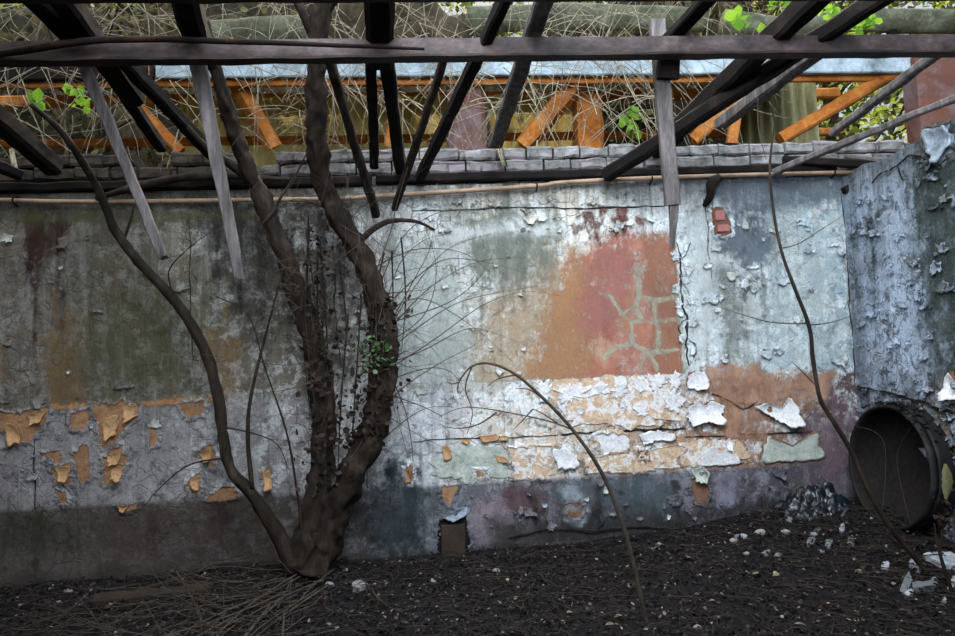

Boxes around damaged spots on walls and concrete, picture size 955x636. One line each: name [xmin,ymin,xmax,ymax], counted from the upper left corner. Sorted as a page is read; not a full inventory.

spalling [915,119,955,210]
water stain [16,208,106,316]
corrosion [472,205,683,382]
crack [602,198,712,371]
flaking render [703,202,750,269]
peeling [881,231,955,321]
spalling [0,378,213,510]
spalling [182,438,244,505]
water stain [364,460,428,558]
water stain [472,471,782,548]
spalling [429,346,849,553]
peeling [889,367,955,465]